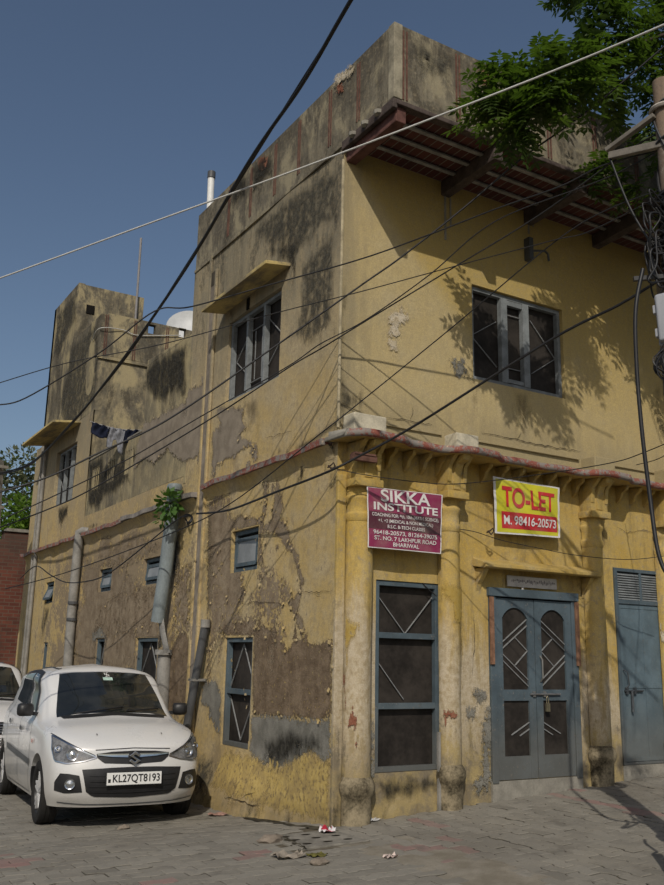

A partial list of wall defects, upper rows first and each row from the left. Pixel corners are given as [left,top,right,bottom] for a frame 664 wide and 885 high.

leakage [258,177,334,263]
leakage [55,300,75,353]
leakage [297,239,332,338]
leakage [61,327,97,420]
leakage [146,348,185,399]
leakage [88,452,134,507]
peeling [210,404,259,477]
peeling [201,479,333,769]
peeling [343,618,359,730]
leakage [384,779,434,799]